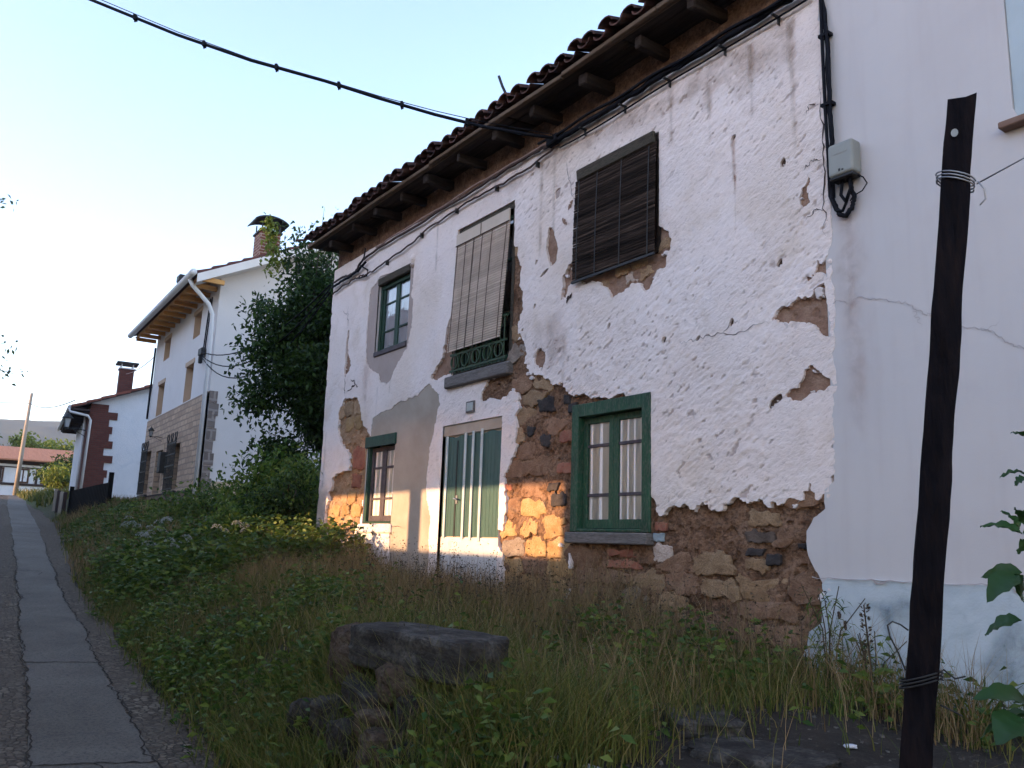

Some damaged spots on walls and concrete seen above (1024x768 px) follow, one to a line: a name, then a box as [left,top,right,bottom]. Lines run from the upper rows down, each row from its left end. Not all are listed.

flaking render [800,179,810,207]
flaking render [544,188,573,274]
flaking render [562,227,671,303]
flaking render [433,307,456,380]
crack [680,321,764,343]
crack [833,296,931,327]
crack [962,324,1024,349]
flaking render [327,397,371,538]
flaking render [482,247,912,673]